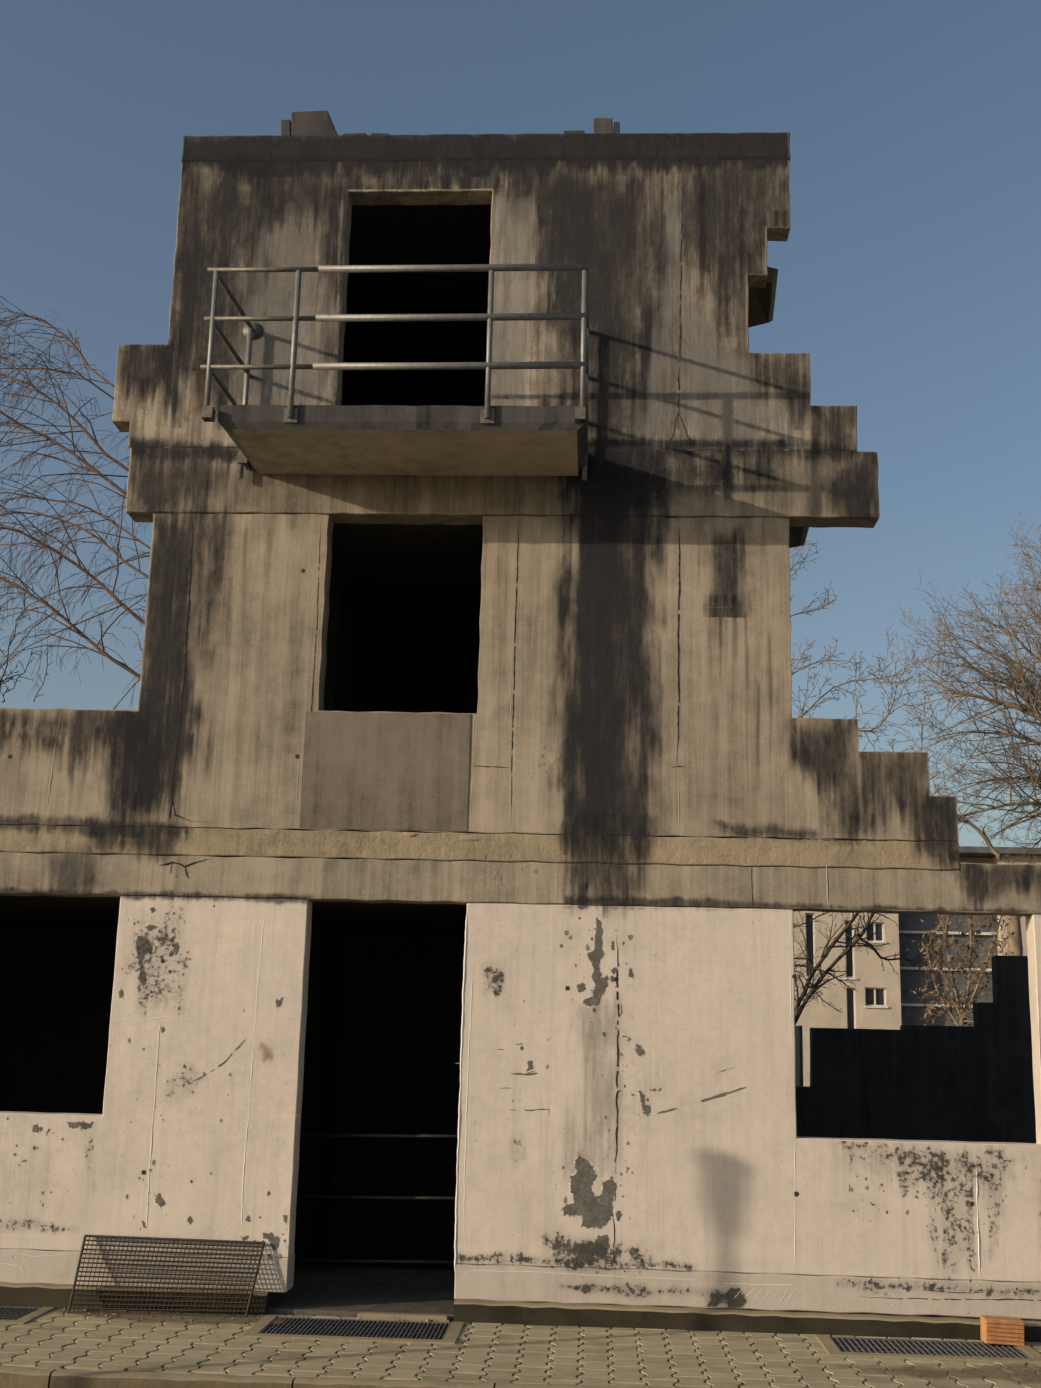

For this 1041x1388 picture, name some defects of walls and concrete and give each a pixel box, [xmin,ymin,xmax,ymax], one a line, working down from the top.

water stain [121,132,878,908]
water stain [0,439,239,894]
water stain [790,719,1041,912]
peeling [119,907,180,1004]
water stain [108,891,308,1015]
peeling [560,904,661,1116]
peeling [550,1116,659,1278]